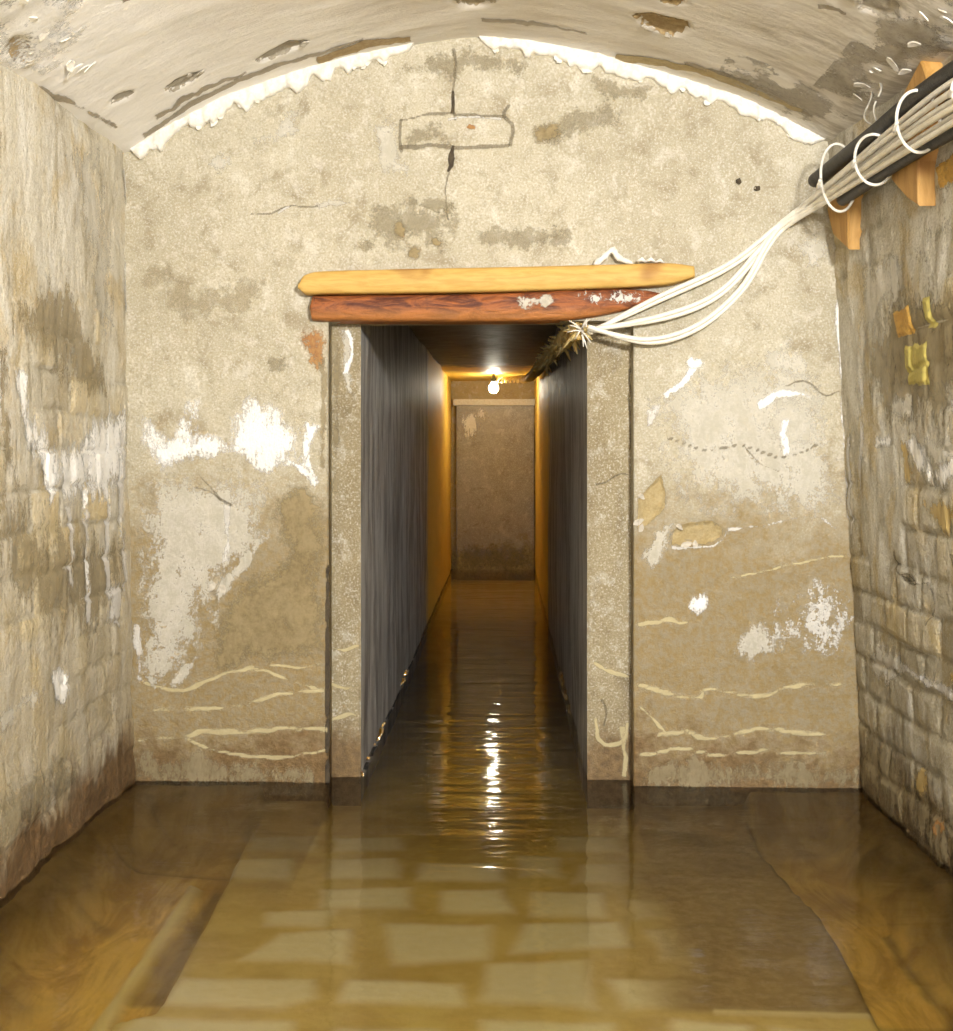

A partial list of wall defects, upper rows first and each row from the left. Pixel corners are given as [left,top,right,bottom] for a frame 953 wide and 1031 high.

peeling [0,0,96,80]
peeling [479,0,953,145]
water stain [0,278,359,692]
spalling [633,475,666,532]
spalling [672,521,722,549]
water stain [254,682,351,702]